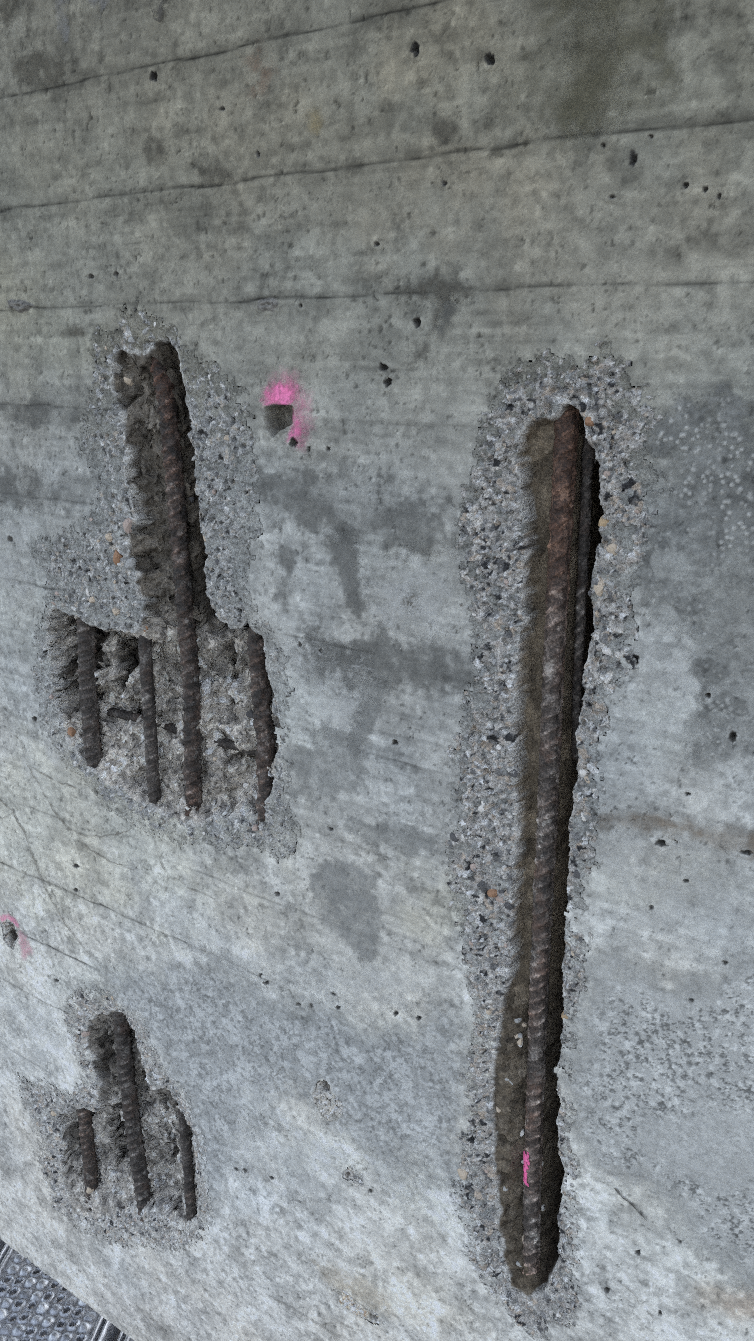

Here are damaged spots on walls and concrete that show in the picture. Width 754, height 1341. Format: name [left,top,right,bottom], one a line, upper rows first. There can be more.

spalling [15,298,754,1341]